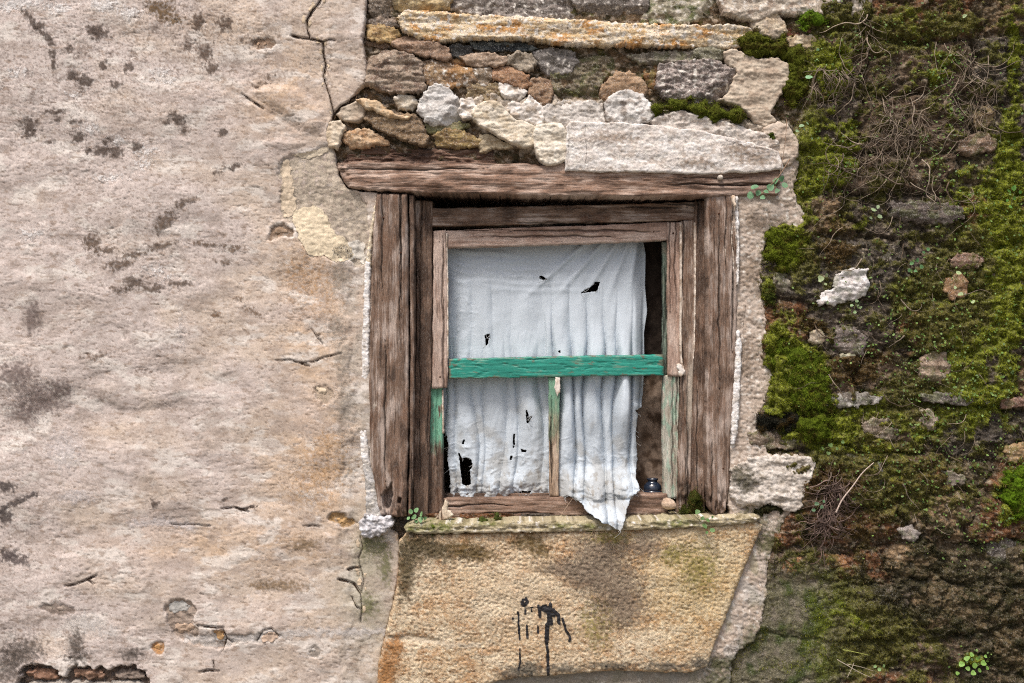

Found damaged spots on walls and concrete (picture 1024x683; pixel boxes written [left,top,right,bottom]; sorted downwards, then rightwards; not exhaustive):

crack [292,0,358,121]
spalling [269,146,369,266]
crack [279,329,337,366]
crack [339,536,367,621]
spalling [20,664,150,683]